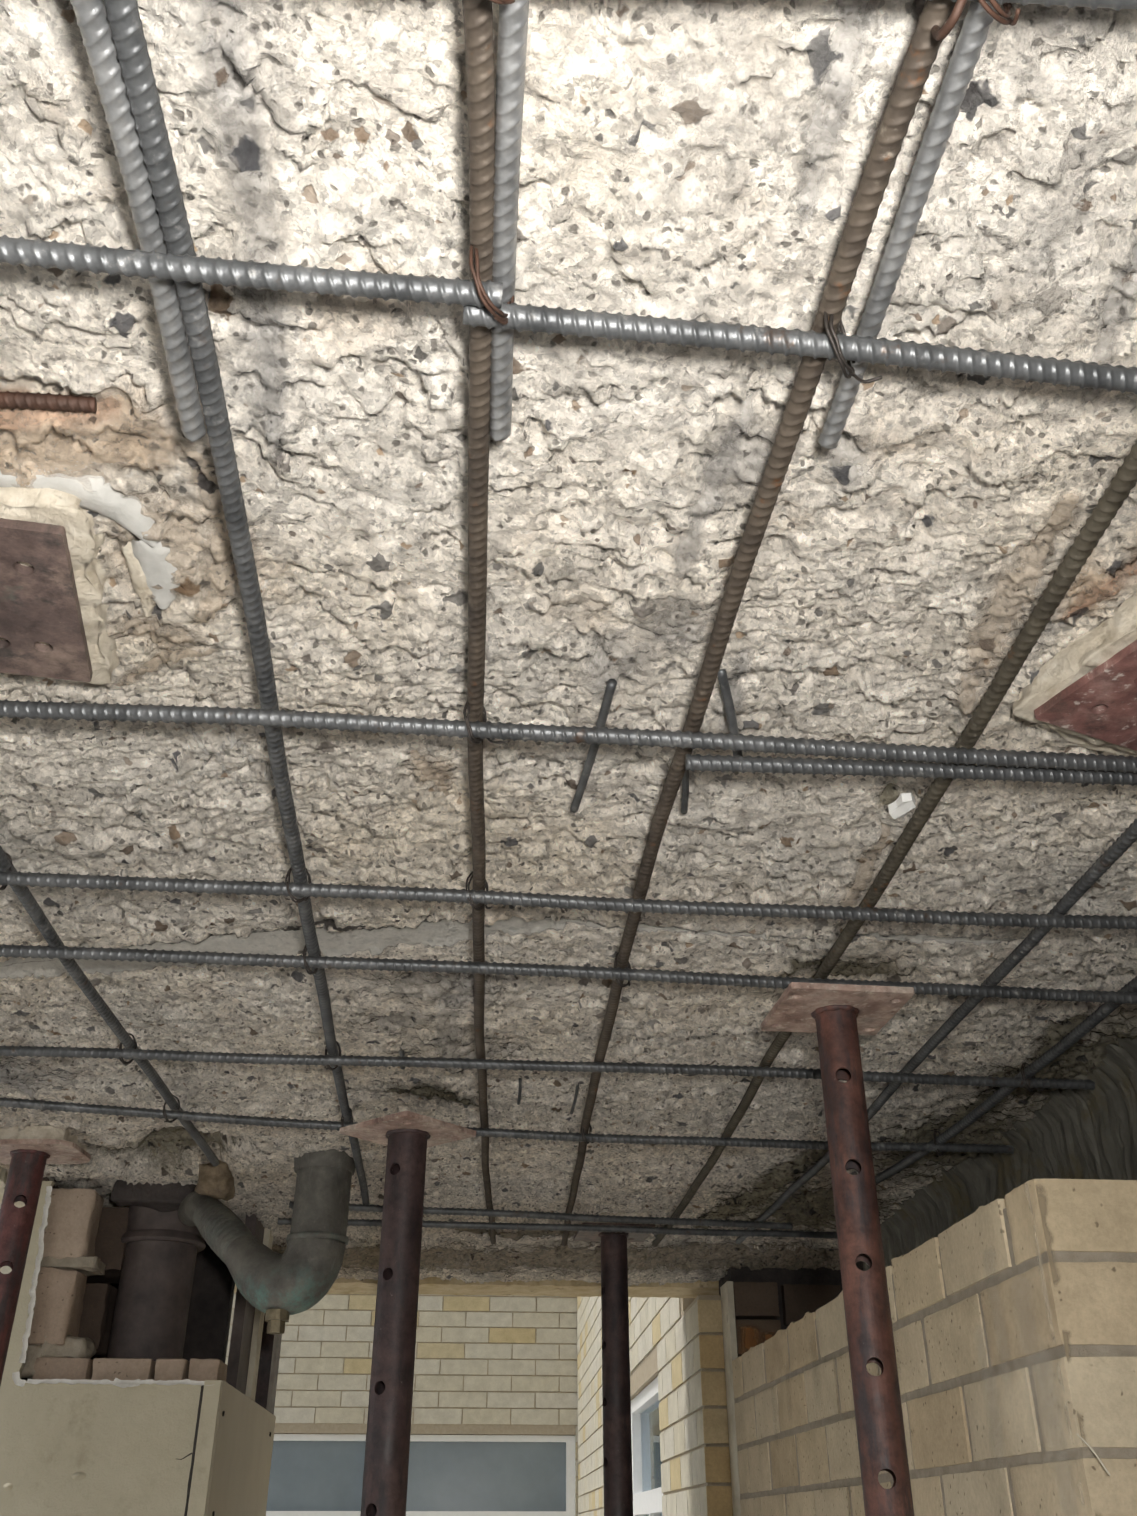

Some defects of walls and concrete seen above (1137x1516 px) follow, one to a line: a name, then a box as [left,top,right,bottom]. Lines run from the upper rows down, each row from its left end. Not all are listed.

rust [931,0,967,41]
rust [0,402,142,472]
spalling [878,783,916,819]
spalling [0,916,1025,979]
spalling [1036,1187,1059,1283]